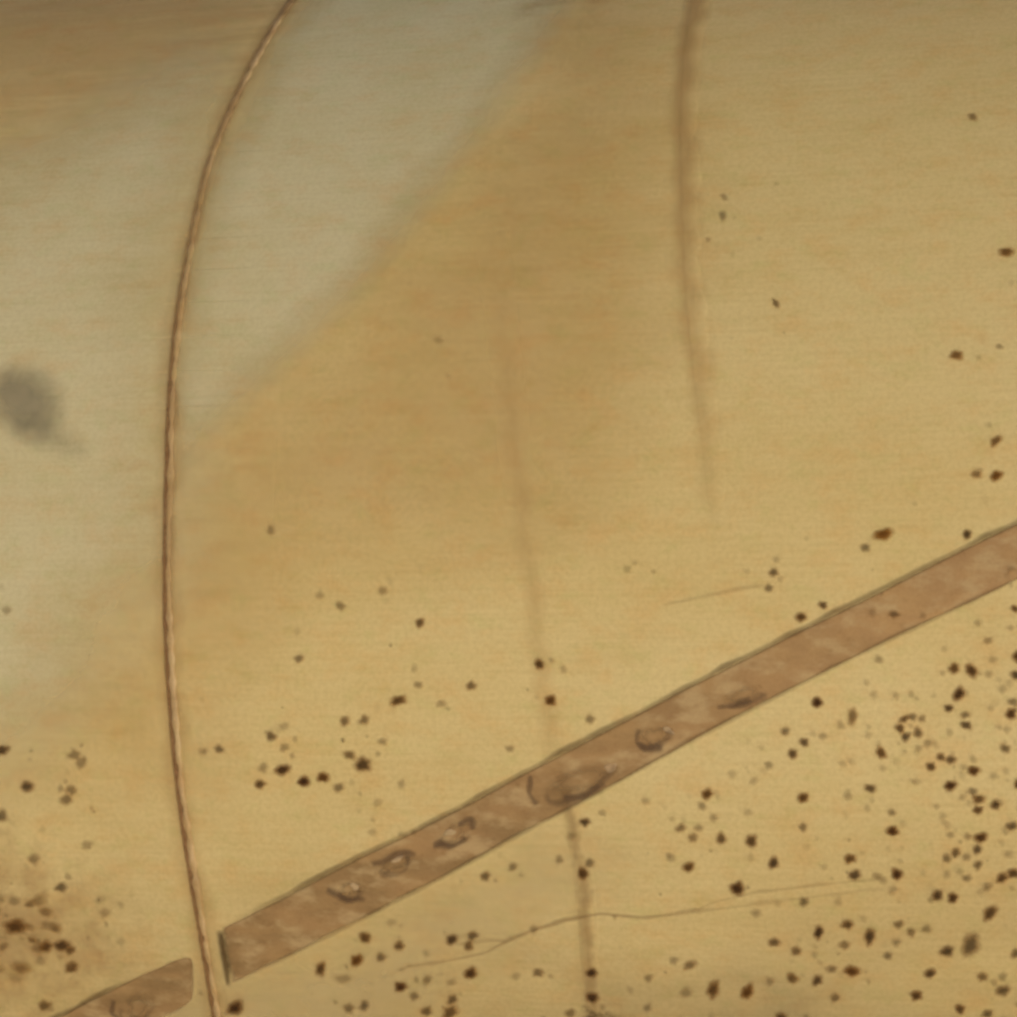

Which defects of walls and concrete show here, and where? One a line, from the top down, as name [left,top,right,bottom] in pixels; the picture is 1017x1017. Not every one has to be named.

rust [875,528,892,540]
rust [949,663,977,677]
rust [946,687,965,712]
rust [346,753,369,771]
rust [298,773,329,787]
rust [973,796,1000,814]
rust [974,833,987,868]
rust [846,855,860,880]
rust [998,870,1017,882]
rust [731,882,744,895]
rust [933,891,958,903]
rust [6,919,76,972]